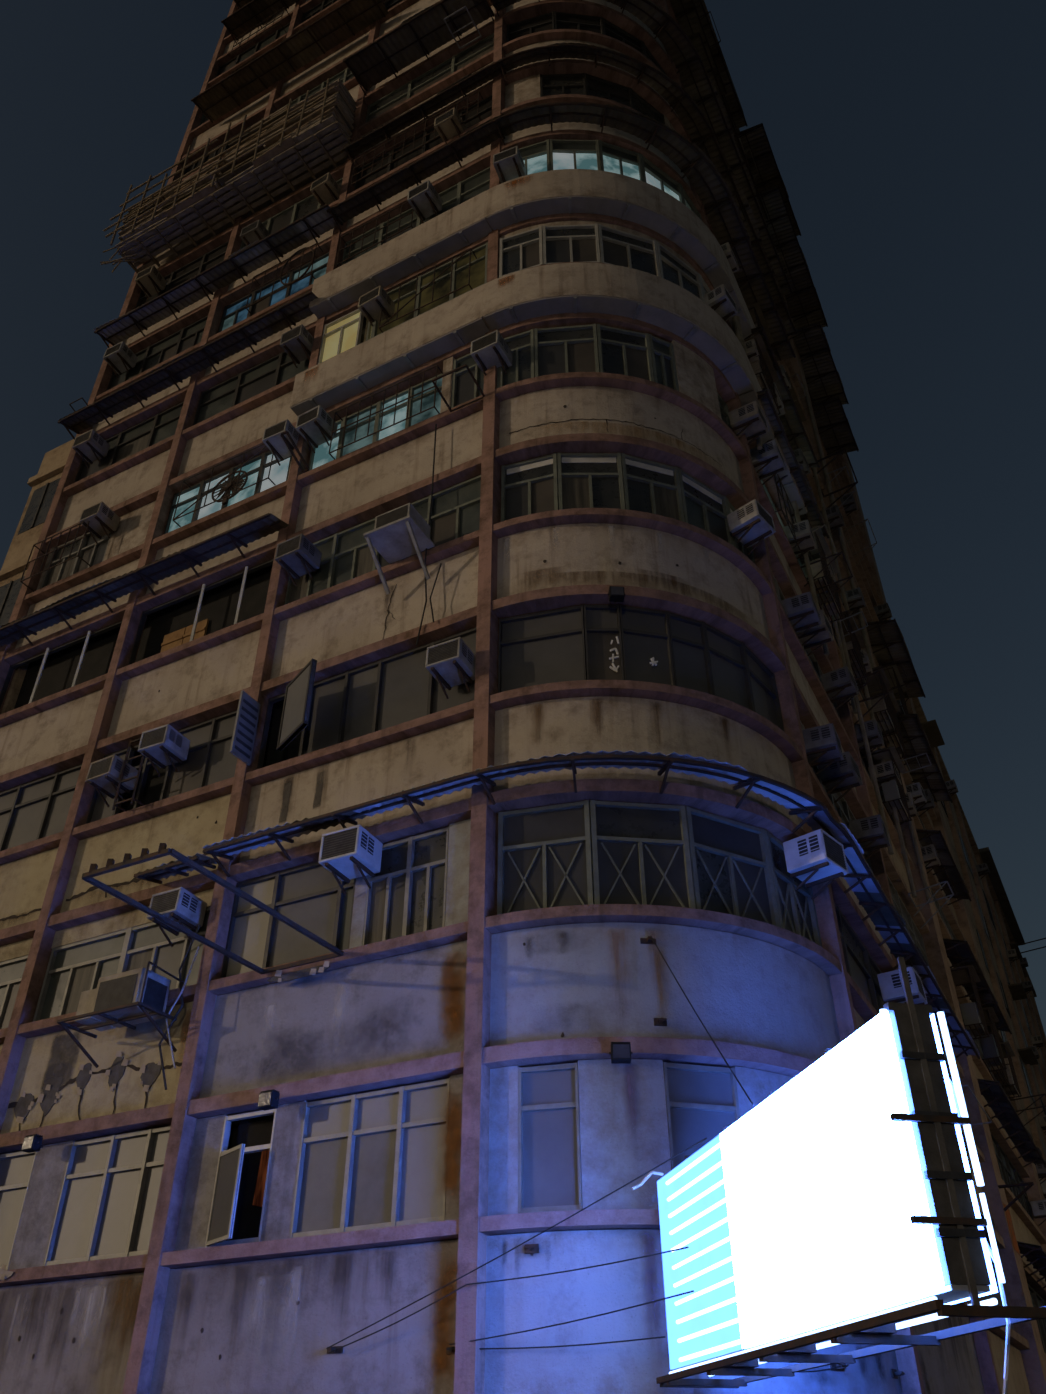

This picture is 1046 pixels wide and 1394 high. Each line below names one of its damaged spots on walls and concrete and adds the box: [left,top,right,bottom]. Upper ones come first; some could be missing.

spalling [14,1032,161,1124]